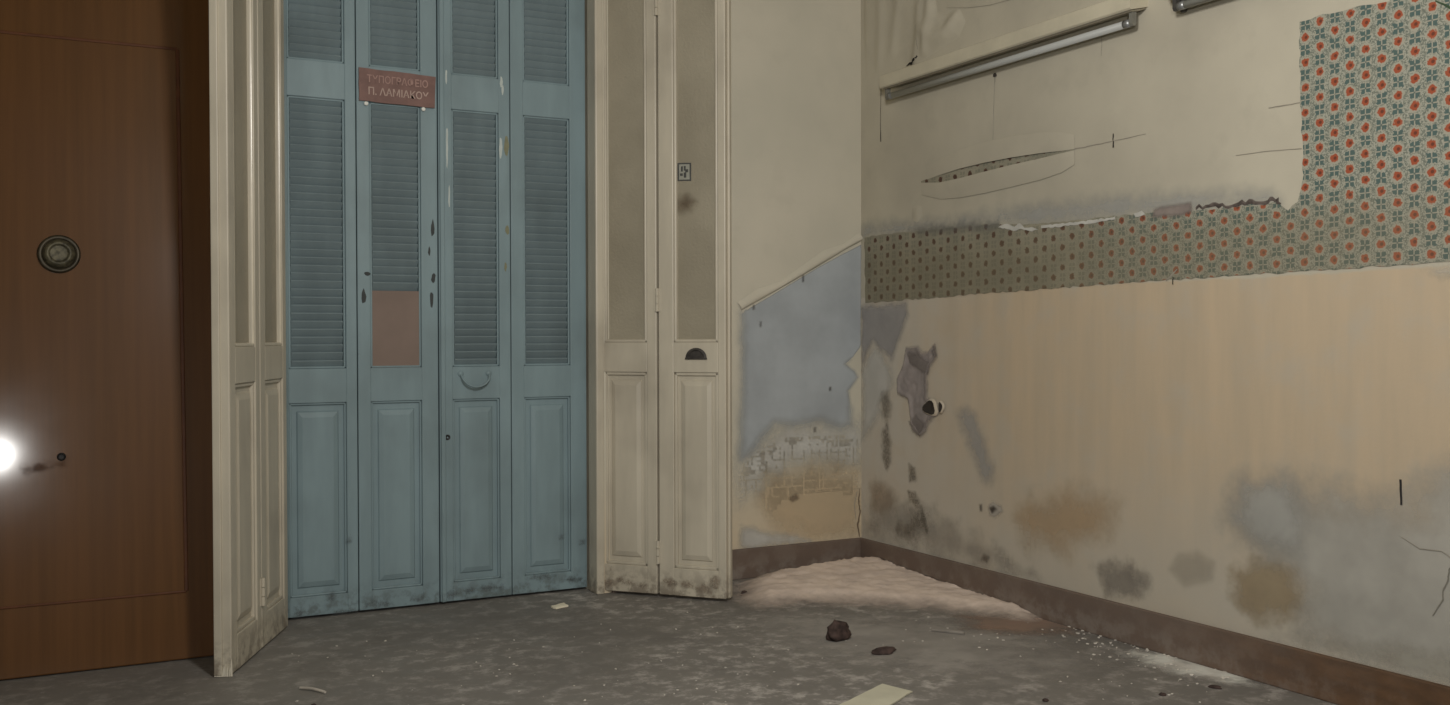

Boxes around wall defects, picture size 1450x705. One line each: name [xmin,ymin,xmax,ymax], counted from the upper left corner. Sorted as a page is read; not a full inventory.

peeling [738,233,945,488]
water stain [741,468,857,548]